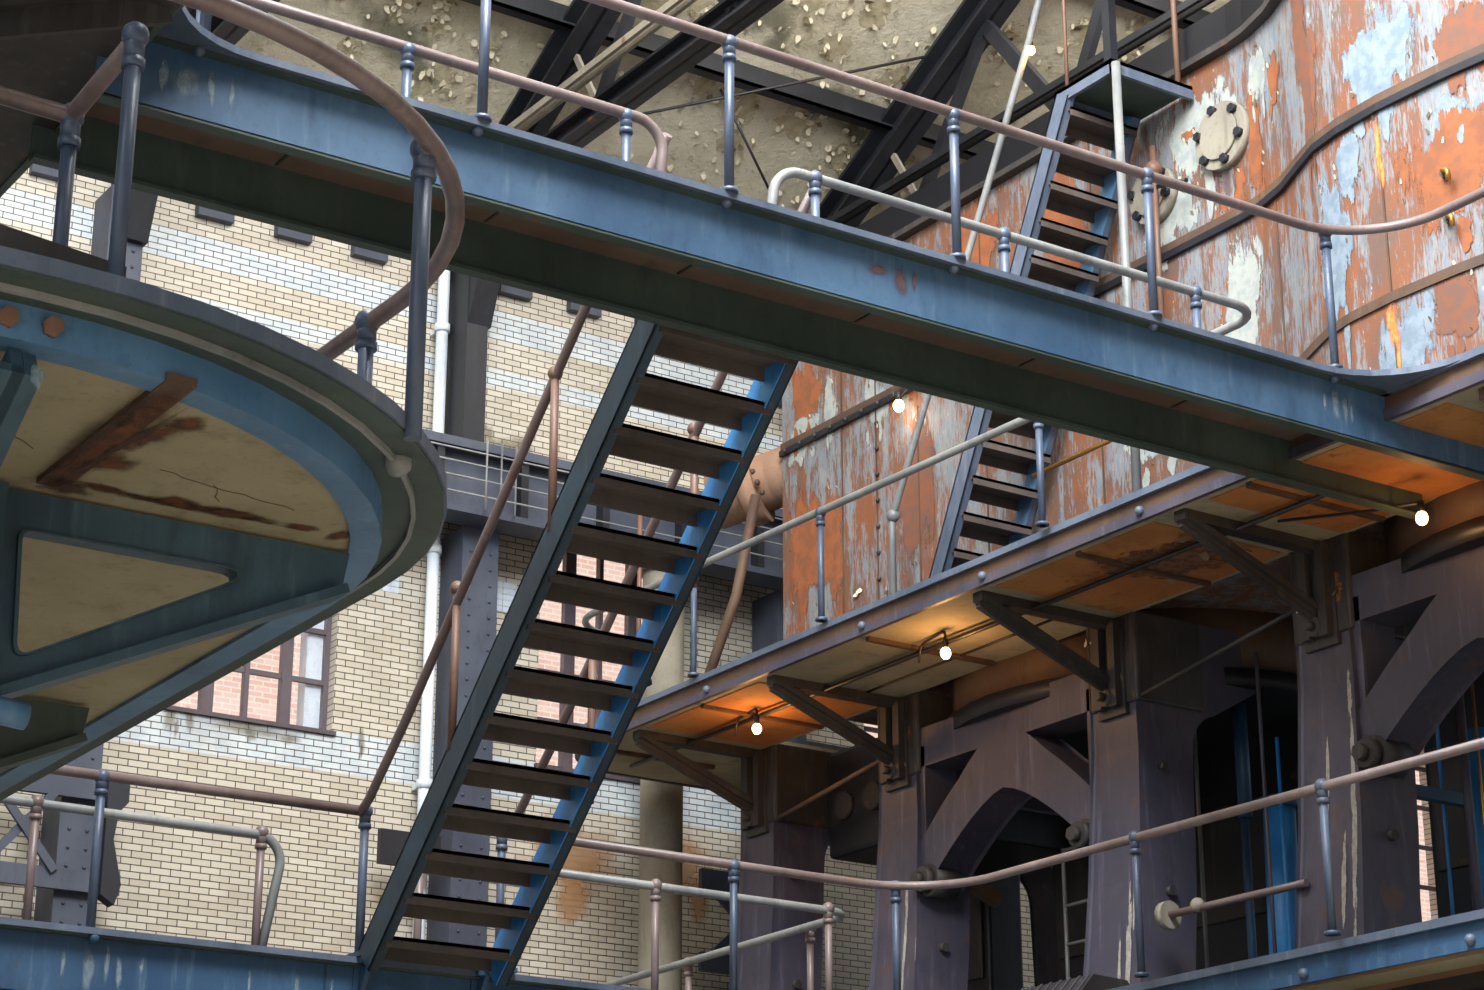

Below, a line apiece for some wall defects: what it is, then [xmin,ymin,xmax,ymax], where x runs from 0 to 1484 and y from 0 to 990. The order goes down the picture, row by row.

peeling [366,0,554,123]
peeling [1140,41,1266,272]
peeling [1318,1,1415,369]
corrosion [1374,1,1484,358]
peeling [1425,93,1467,143]
peeling [1220,235,1263,345]
corrosion [1387,307,1401,368]
peeling [1378,290,1436,369]
corrosion [39,394,350,540]
peeling [864,378,889,445]